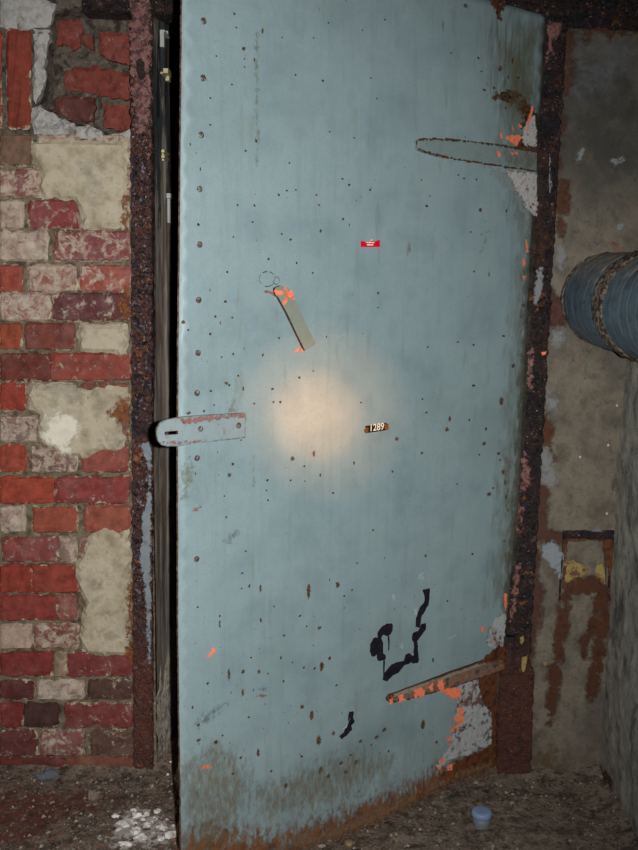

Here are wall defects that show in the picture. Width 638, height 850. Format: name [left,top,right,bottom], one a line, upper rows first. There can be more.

peeling [545,20,562,63]
spalling [0,0,153,230]
corrosion [416,66,539,172]
peeling [500,106,537,155]
corrosion [555,179,571,238]
corrosion [180,404,245,425]
peeling [389,167,566,789]
peeling [370,573,430,681]
corrosion [529,485,614,725]
corrosion [185,746,492,850]